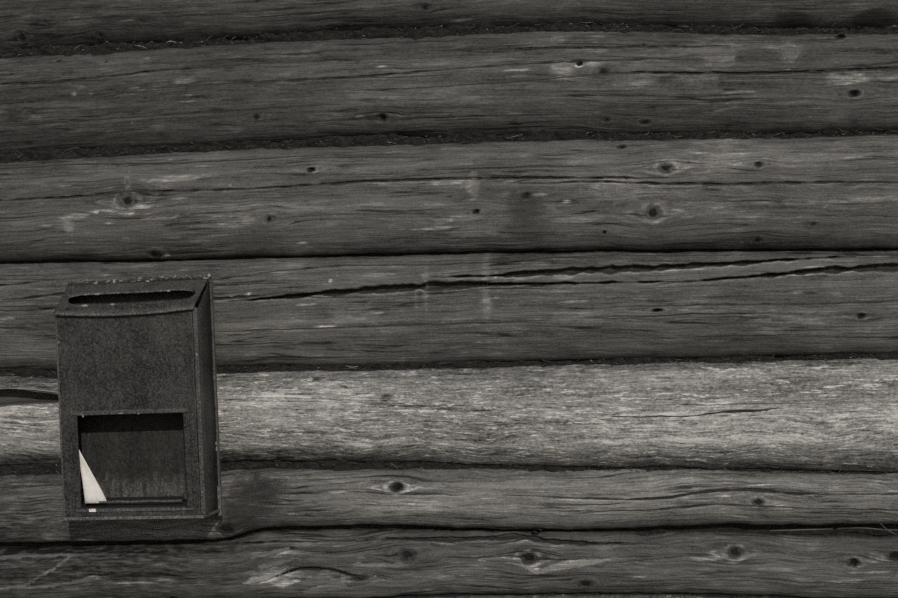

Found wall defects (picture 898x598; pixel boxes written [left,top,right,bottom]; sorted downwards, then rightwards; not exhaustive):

crack [0,279,64,311]
crack [213,254,898,307]
crack [208,532,661,546]
crack [275,566,365,578]